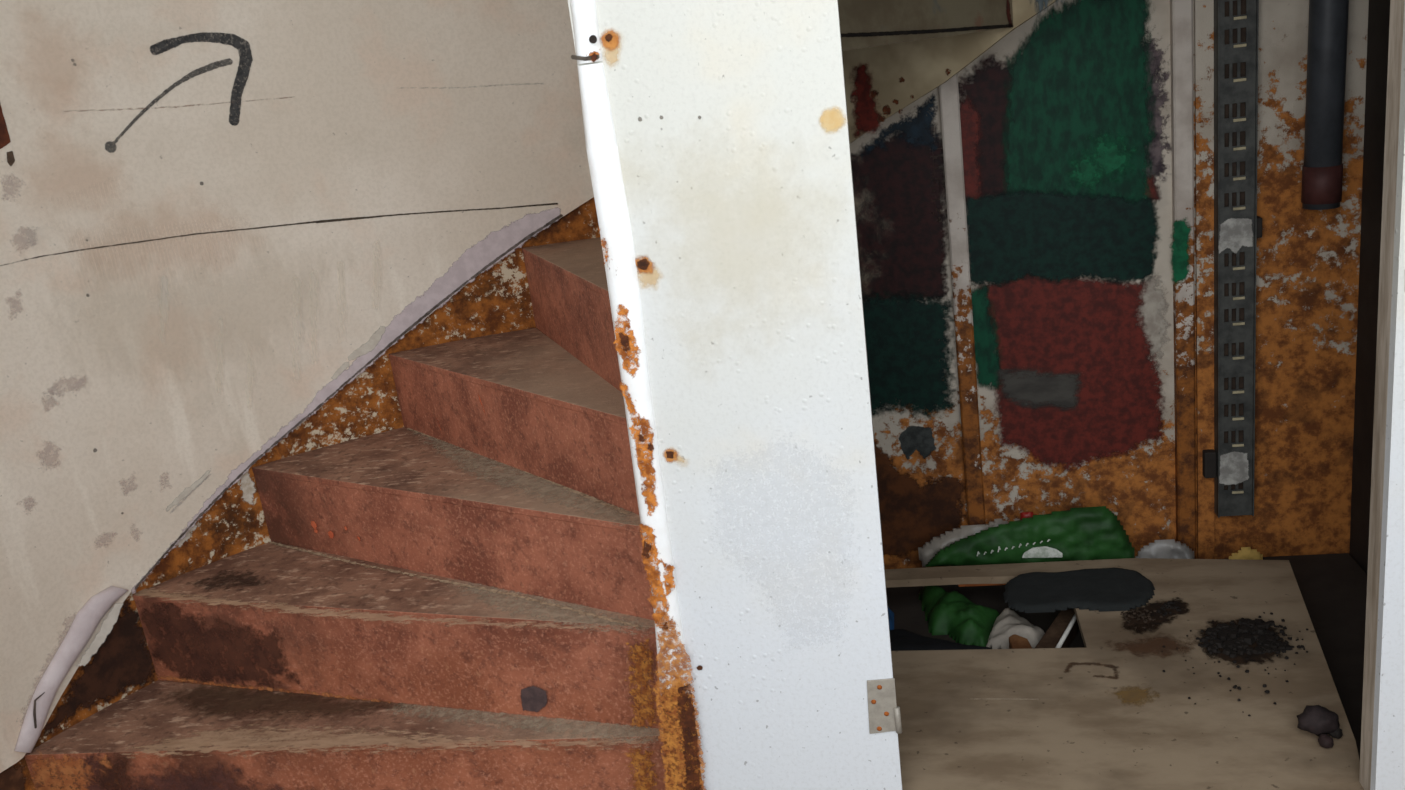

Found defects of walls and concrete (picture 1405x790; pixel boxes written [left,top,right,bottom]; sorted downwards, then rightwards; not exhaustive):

corrosion [589,30,619,63]
corrosion [635,256,658,284]
corrosion [874,442,966,559]
corrosion [614,304,706,790]
corrosion [44,601,391,736]
corrosion [520,686,547,712]
corrosion [0,755,117,790]